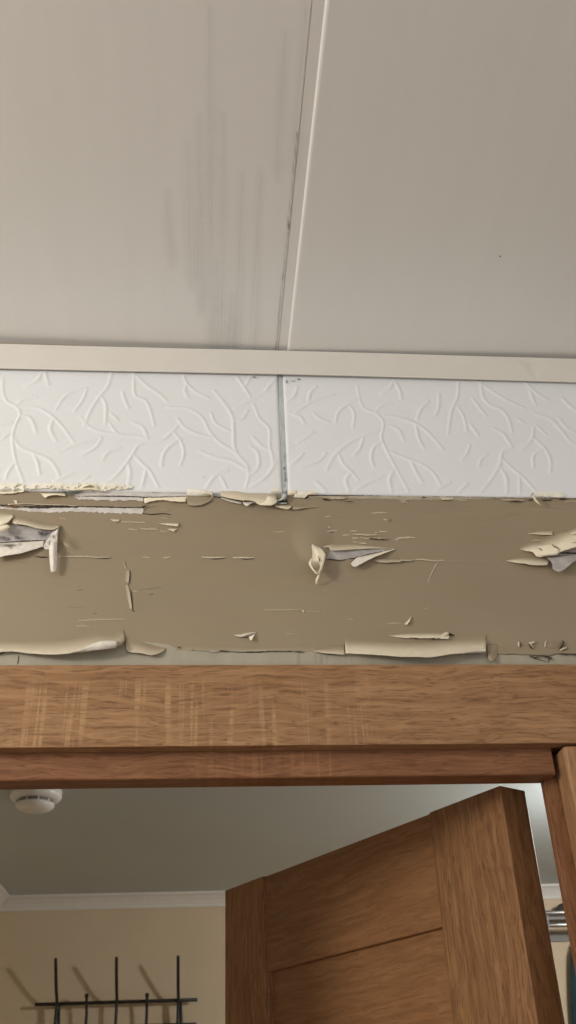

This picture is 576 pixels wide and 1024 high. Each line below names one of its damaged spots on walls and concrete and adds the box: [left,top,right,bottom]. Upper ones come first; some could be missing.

peeling [0,483,576,585]
peeling [0,617,576,661]